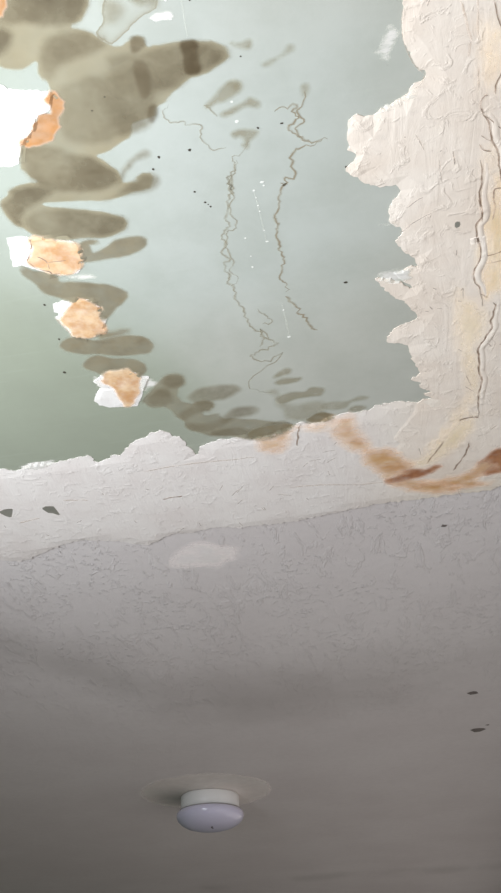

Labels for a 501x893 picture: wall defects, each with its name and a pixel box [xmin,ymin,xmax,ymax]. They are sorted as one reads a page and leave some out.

water stain [204,82,239,111]
water stain [0,0,228,262]
crack [460,56,501,421]
water stain [21,267,128,320]
water stain [58,330,153,377]
water stain [143,375,293,439]
water stain [276,369,323,403]
water stain [307,412,333,422]
rust [337,419,501,492]